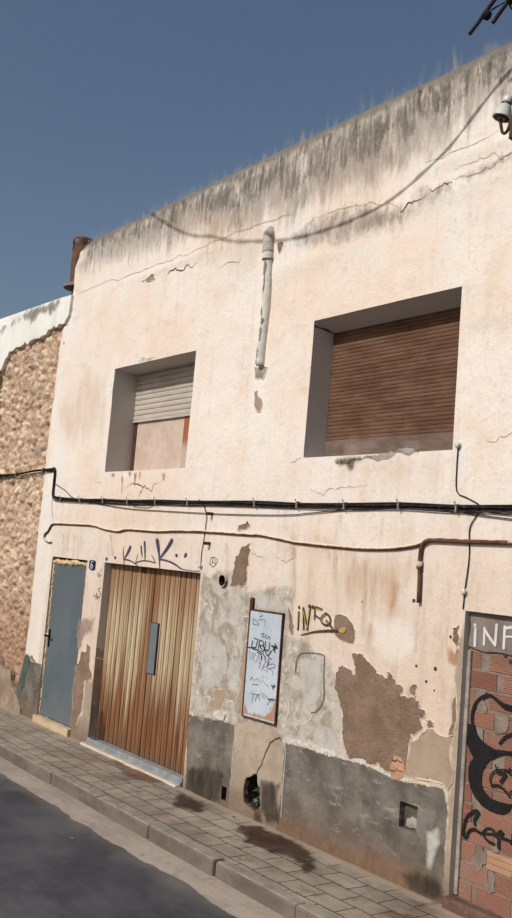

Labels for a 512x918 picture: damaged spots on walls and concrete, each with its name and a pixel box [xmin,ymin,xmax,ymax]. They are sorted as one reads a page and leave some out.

leakage [87,78,450,258]
crack [323,139,512,216]
crack [83,213,297,292]
spalling [254,307,268,413]
spalling [335,448,420,463]
spalling [230,542,251,588]
spalling [70,644,104,737]
spalling [281,613,458,809]
spalling [244,774,260,811]
leakage [238,783,315,872]
leakage [407,875,439,897]
leakage [427,829,439,867]